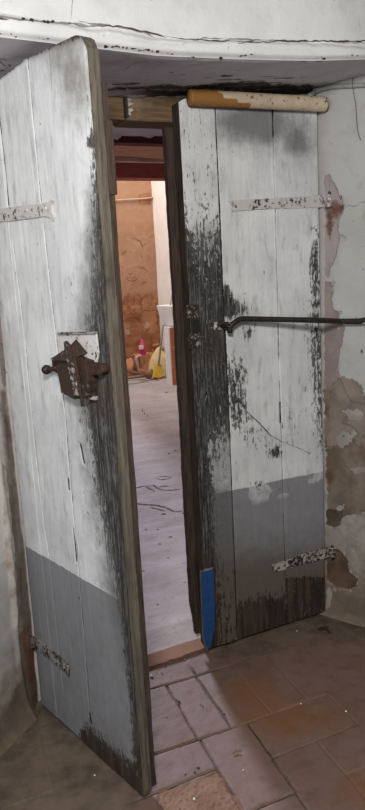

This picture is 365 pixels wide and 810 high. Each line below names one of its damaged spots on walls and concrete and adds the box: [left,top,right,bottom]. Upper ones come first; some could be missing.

crack [0,0,365,44]
flaking render [323,174,365,609]